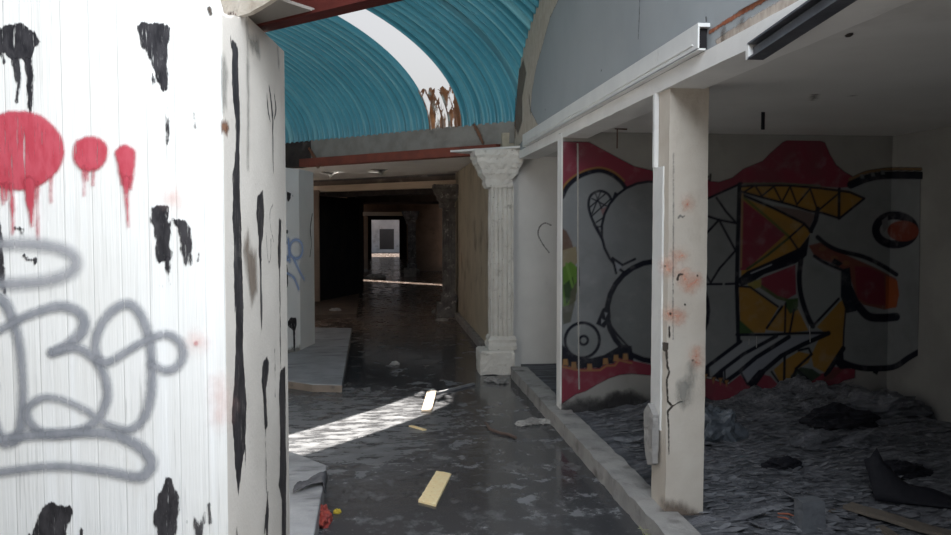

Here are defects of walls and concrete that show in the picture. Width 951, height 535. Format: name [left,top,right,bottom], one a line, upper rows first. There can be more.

rust [709,0,765,34]
crack [662,326,682,454]